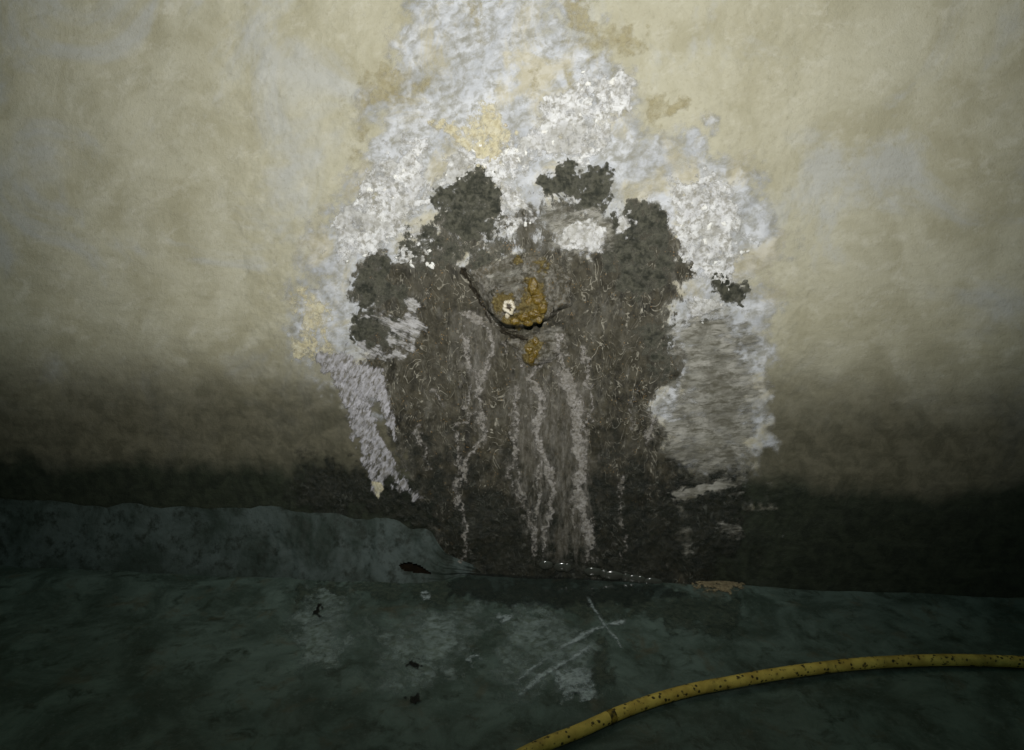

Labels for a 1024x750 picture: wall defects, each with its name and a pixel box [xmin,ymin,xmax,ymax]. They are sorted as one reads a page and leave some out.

crack [459,268,554,354]
rust [491,255,550,366]
leakage [283,0,785,702]